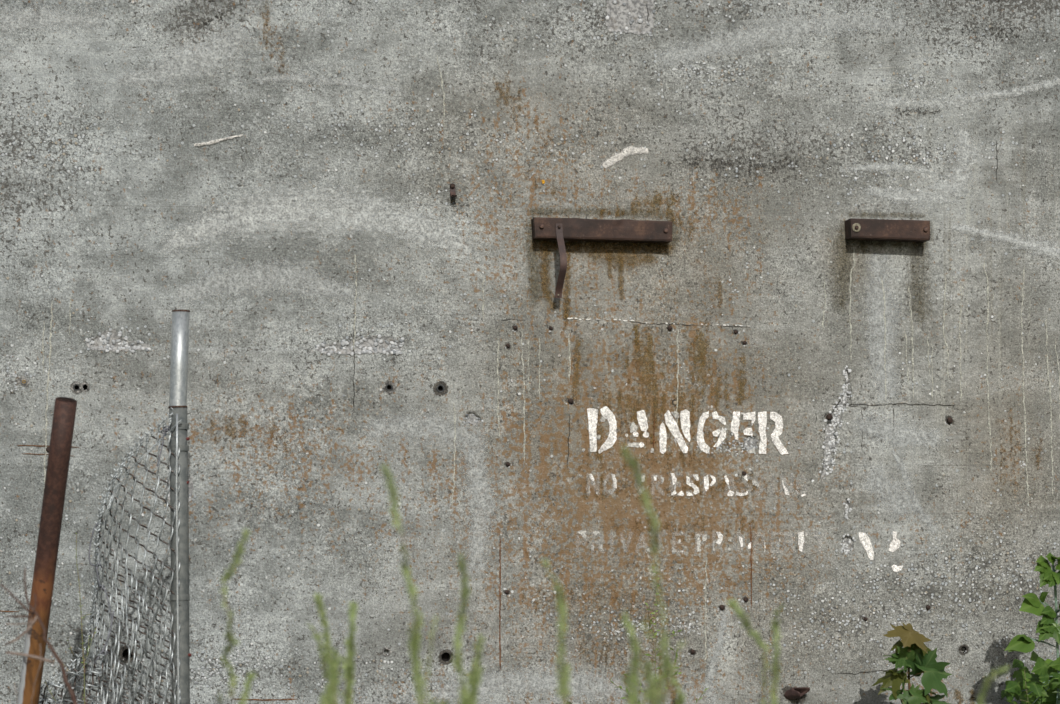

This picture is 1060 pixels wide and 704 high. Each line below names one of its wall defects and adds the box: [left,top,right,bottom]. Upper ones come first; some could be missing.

rust [600,190,694,237]
rust [535,241,671,329]
damp [839,224,864,363]
rust [211,418,253,442]
rust [596,323,747,468]
spalling [819,366,852,479]
rust [730,518,754,608]